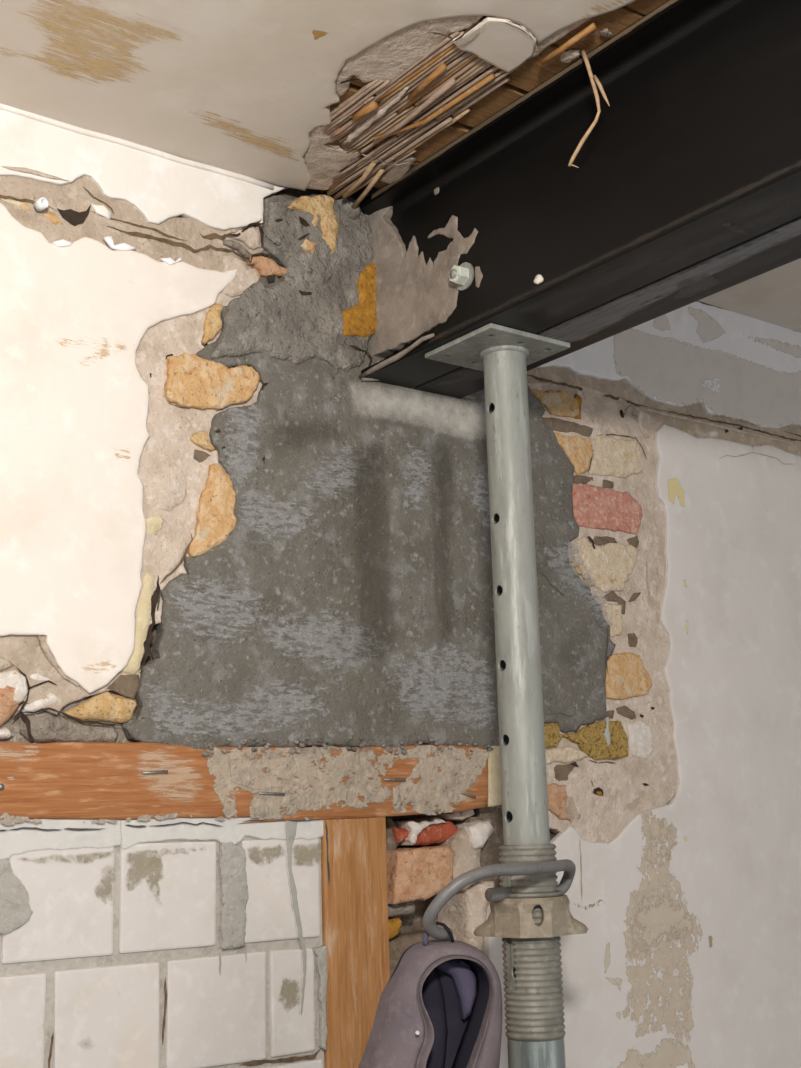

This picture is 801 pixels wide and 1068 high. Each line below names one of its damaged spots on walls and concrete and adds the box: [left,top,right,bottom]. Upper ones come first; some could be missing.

flaking render [0,166,287,743]
flaking render [342,263,377,338]
flaking render [287,16,593,255]
flaking render [527,307,801,1068]